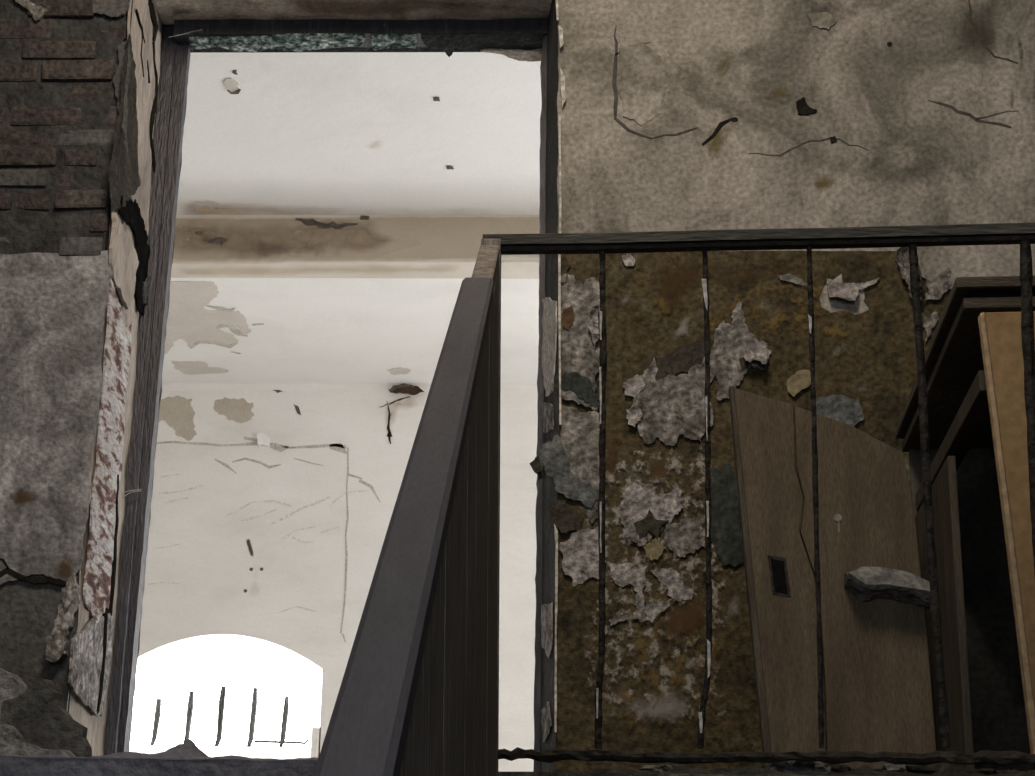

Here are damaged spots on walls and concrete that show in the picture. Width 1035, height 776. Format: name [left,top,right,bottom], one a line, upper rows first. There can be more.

spalling [556,0,564,49]
spalling [558,68,566,233]
crack [612,25,734,146]
crack [928,100,1019,128]
damp [179,228,385,254]
spalling [0,0,150,716]
peeling [164,281,264,375]
peeling [159,396,197,441]
peeling [213,397,254,423]
crack [0,558,66,586]
crack [156,436,380,642]
peeling [530,253,879,743]